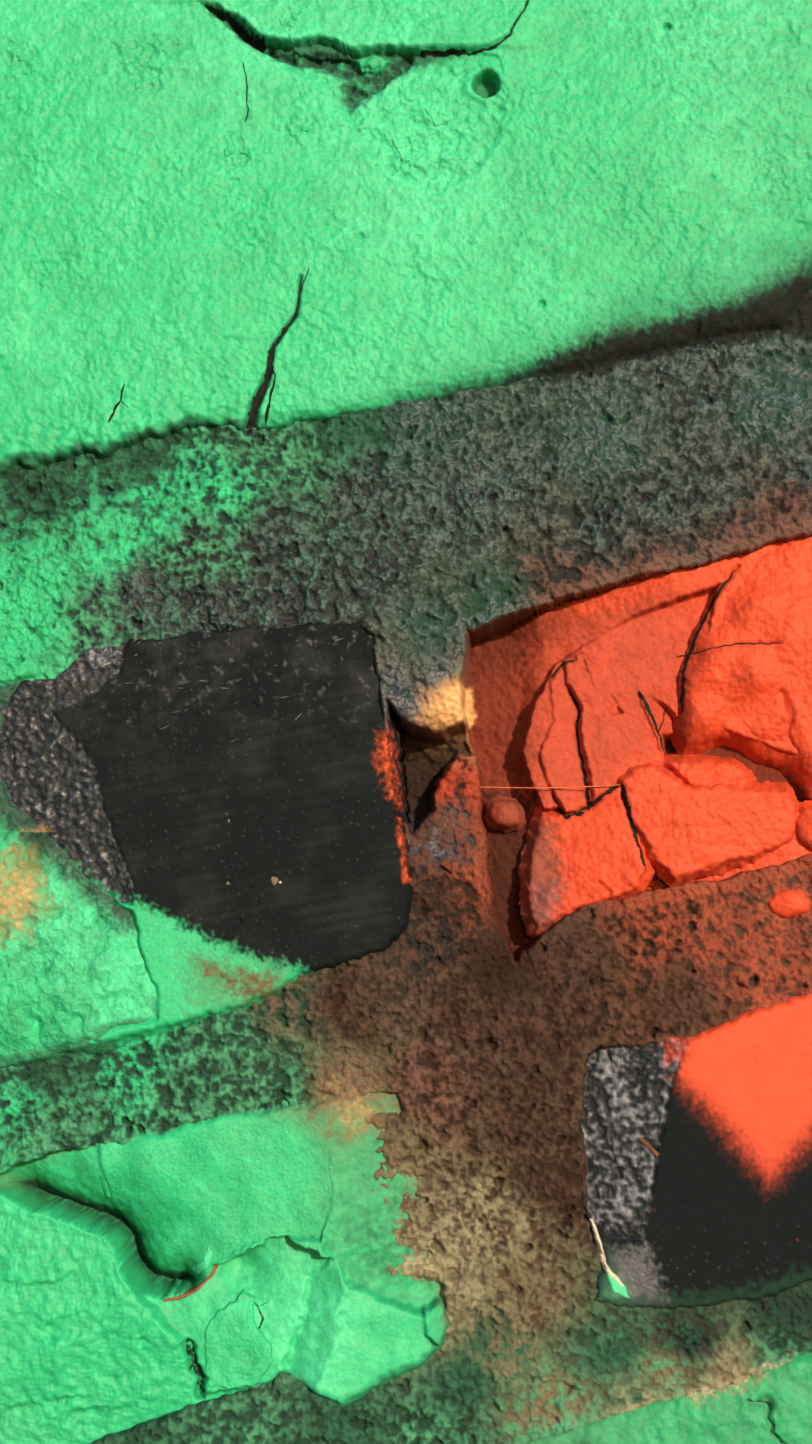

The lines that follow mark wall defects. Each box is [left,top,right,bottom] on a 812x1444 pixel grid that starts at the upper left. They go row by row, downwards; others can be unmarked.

crack [204,5,267,122]
crack [420,0,529,58]
crack [247,269,309,435]
spalling [0,642,134,901]
crack [551,660,646,871]
spalling [518,536,812,937]
crack [639,567,781,755]
spalling [0,1100,332,1302]
spalling [204,1289,274,1389]